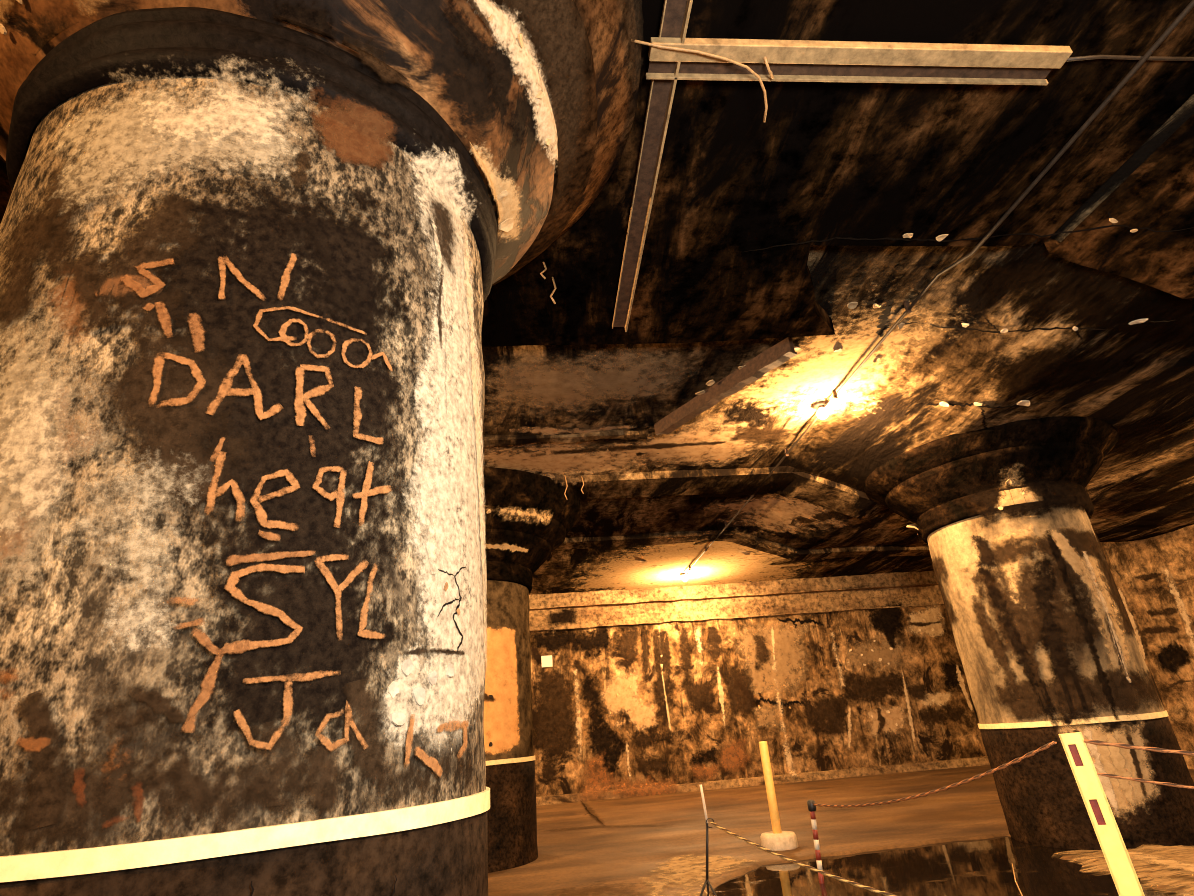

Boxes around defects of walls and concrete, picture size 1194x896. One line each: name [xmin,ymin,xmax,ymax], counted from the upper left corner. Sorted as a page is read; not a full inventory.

leakage [0,61,487,856]
leakage [932,557,958,626]
leakage [573,669,582,755]
leakage [613,626,725,730]
leakage [771,627,797,776]
leakage [902,673,915,741]
leakage [956,665,978,720]
leakage [972,525,1194,816]
leakage [541,750,555,781]